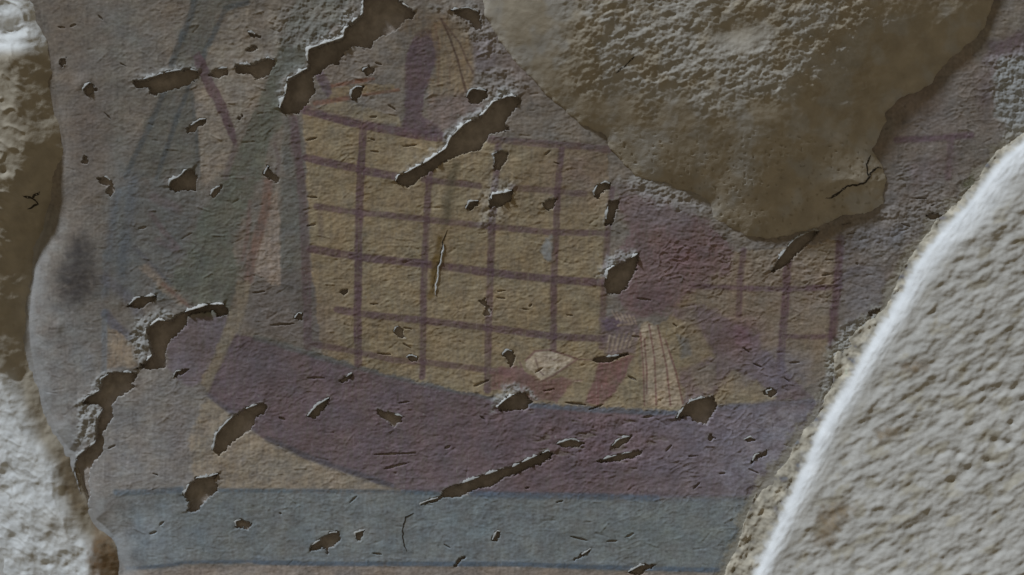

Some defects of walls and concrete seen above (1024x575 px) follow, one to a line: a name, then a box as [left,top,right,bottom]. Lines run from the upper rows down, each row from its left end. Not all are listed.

flaking render [135,30,275,95]
flaking render [279,0,415,114]
flaking render [466,87,487,104]
flaking render [168,169,198,191]
crack [829,155,879,199]
flaking render [604,253,638,294]
flaking render [74,302,229,497]
flaking render [211,404,268,454]
flaking render [496,393,532,411]
flaking render [676,396,716,441]
flaking render [182,473,218,511]
flaking render [311,531,340,551]